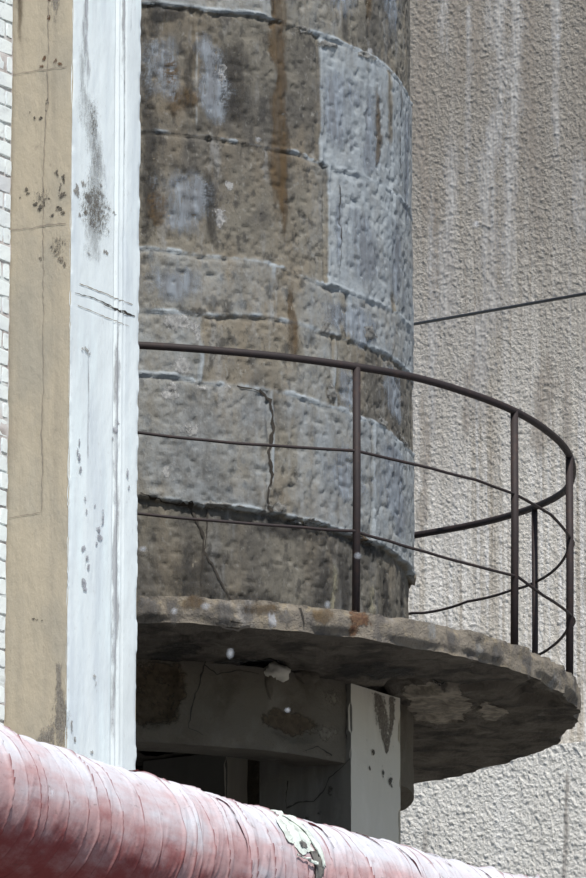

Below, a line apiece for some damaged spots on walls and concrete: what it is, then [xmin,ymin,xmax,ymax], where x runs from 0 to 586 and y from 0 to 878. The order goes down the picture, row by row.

leakage [552,0,560,137]
corrosion [270,0,290,228]
leakage [473,0,523,409]
crack [77,284,135,326]
corrosion [288,292,297,355]
leakage [428,158,456,423]
crack [237,385,275,511]
corrosion [349,611,371,636]
leakage [36,663,68,746]
spalling [136,661,187,727]
spalling [262,661,320,737]
spalling [372,681,509,755]